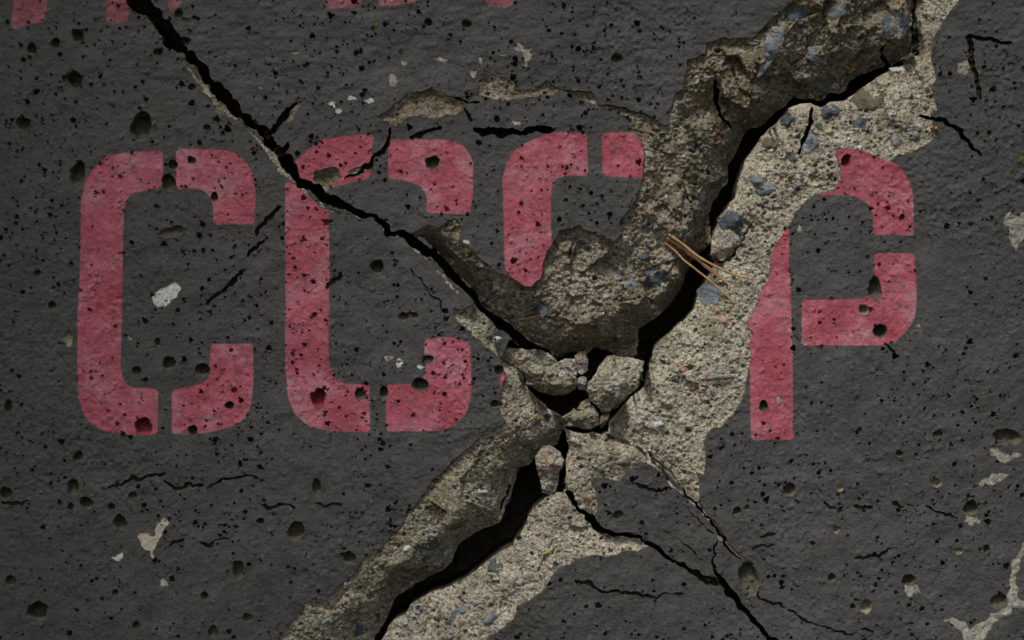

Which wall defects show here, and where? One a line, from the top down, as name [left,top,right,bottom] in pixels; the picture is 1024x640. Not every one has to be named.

crack [966,34,1012,100]
crack [919,114,982,156]
crack [108,0,920,640]
spalling [277,0,959,640]
crack [823,501,958,519]